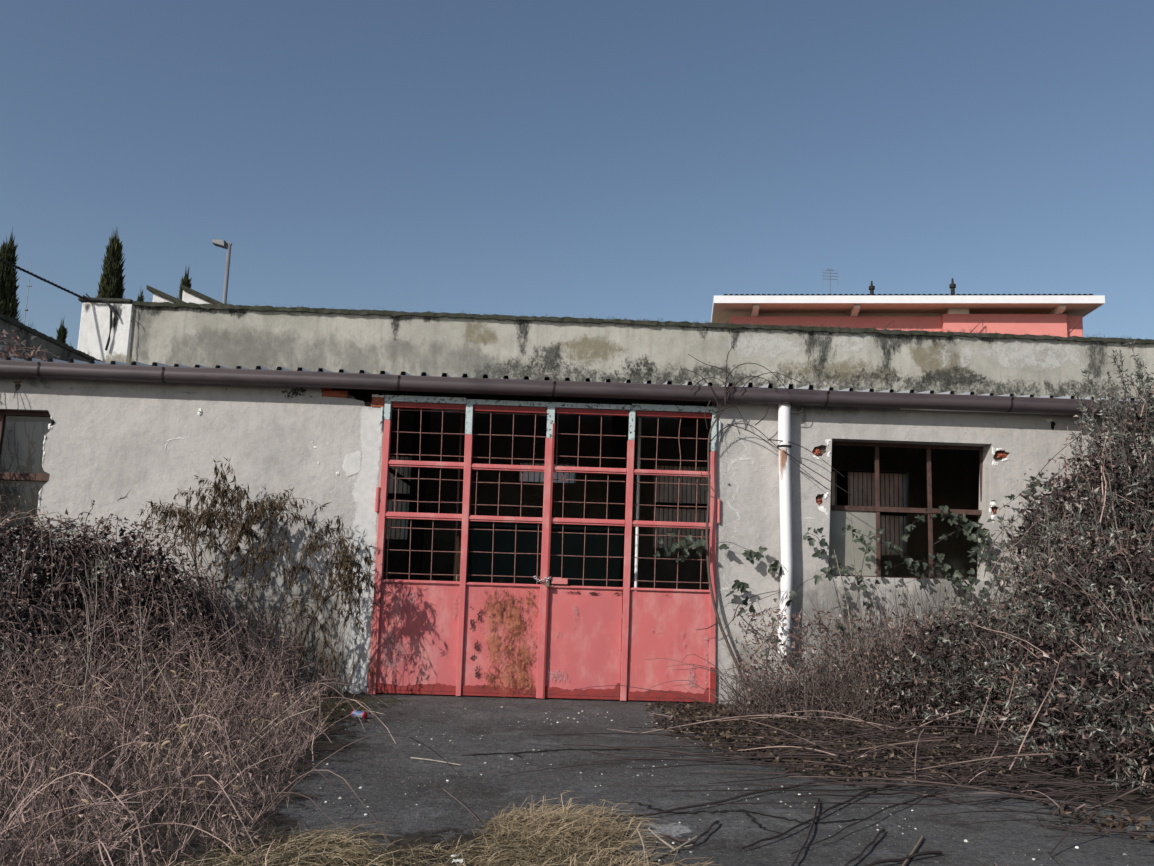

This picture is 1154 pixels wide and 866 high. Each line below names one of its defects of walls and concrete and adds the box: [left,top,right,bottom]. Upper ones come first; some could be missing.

water stain [112,303,122,327]
water stain [141,305,261,318]
water stain [391,316,431,332]
water stain [474,320,1120,398]
spalling [320,388,385,407]
flaking render [812,439,831,461]
flaking render [992,447,1009,466]
corrosion [480,589,538,694]